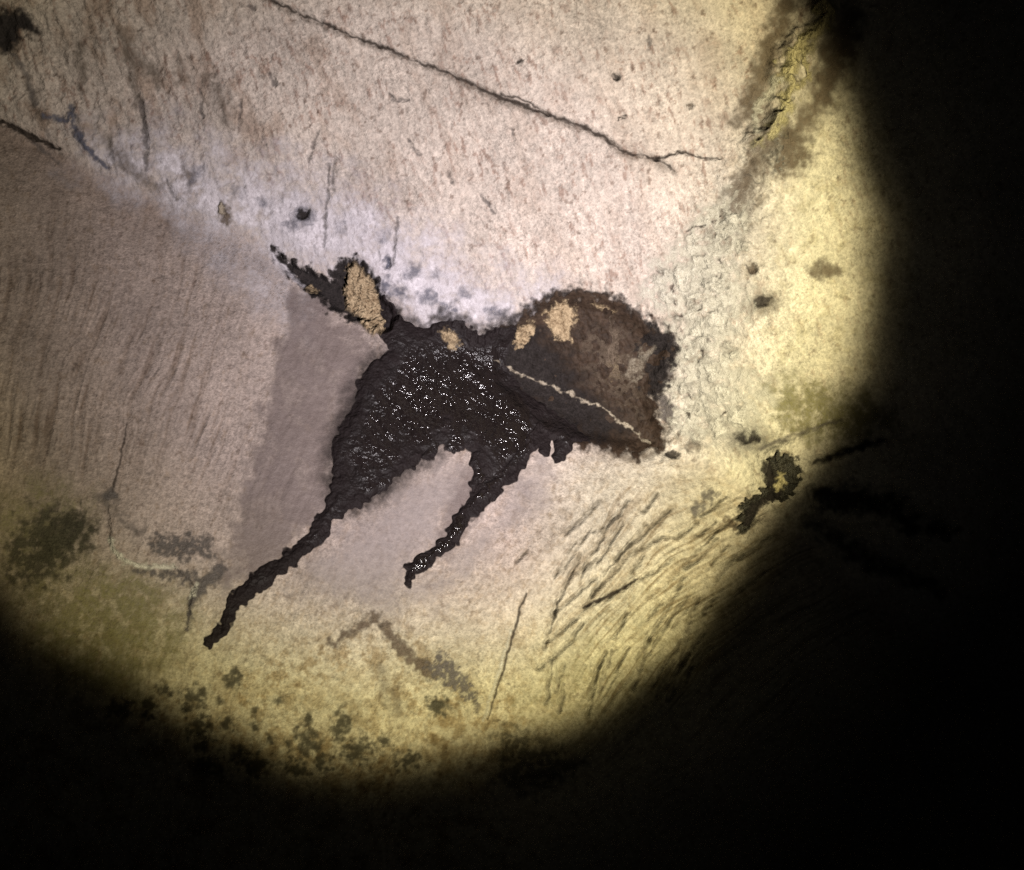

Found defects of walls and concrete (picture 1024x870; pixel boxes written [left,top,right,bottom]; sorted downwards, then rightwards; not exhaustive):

crack [0,120,61,152]
crack [271,0,720,170]
damp [753,0,836,146]
spalling [270,245,398,335]
damp [42,105,591,650]
spalling [496,288,694,464]
damp [8,502,98,589]
crack [482,593,527,721]